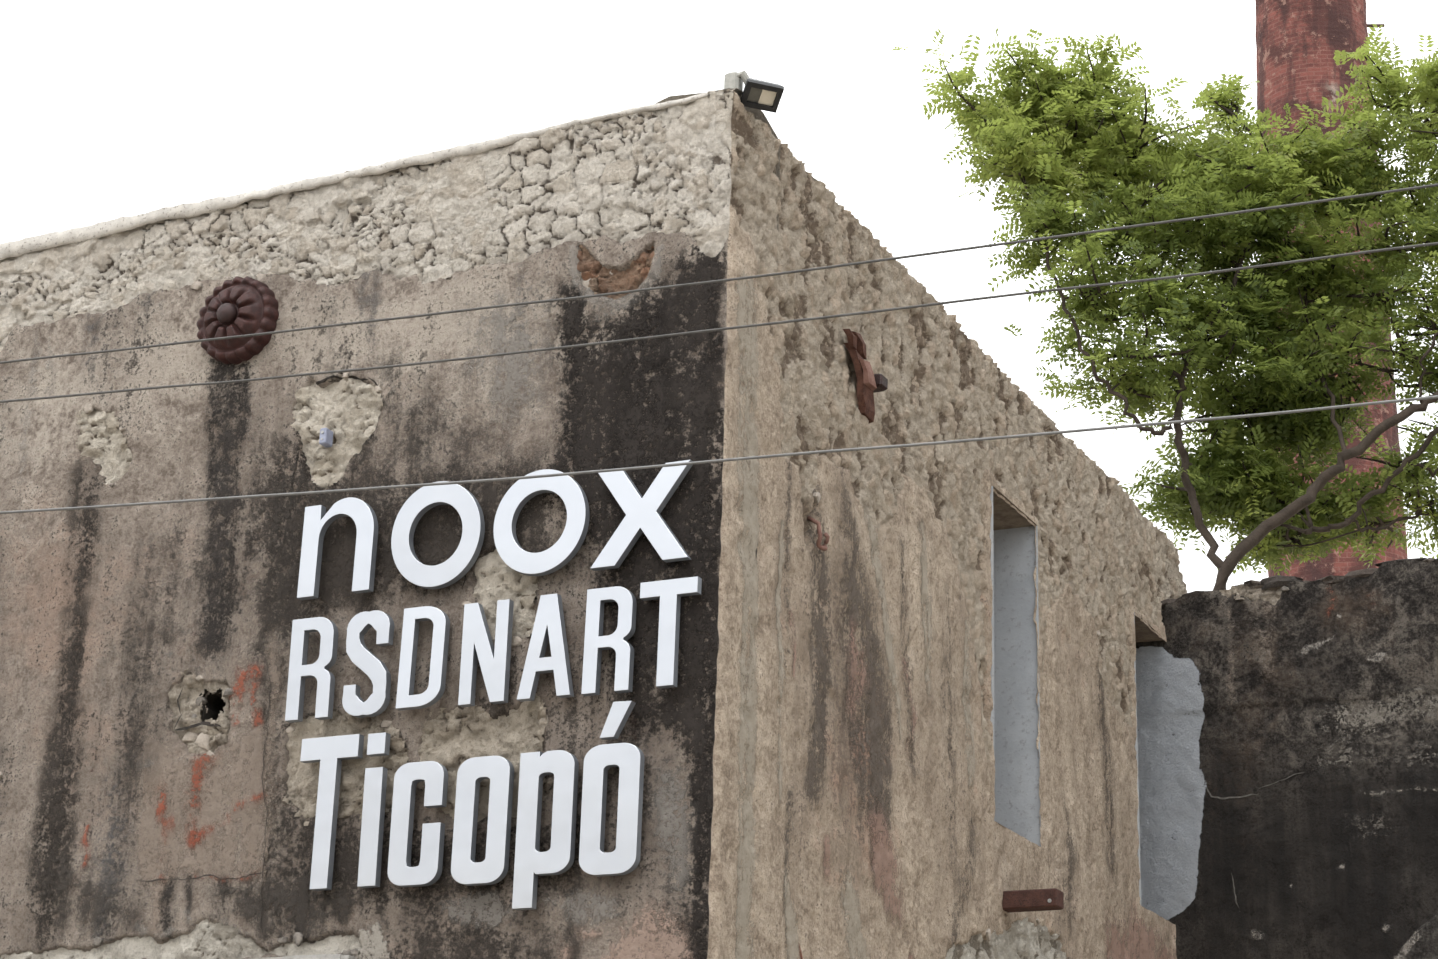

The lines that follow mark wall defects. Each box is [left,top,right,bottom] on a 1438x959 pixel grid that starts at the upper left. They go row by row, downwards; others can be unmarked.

leakage [29,462,192,951]
flaking render [0,919,362,959]
flaking render [282,693,549,826]
leakage [196,249,975,959]
flaking render [0,89,1187,805]
leakage [1316,686,1438,768]